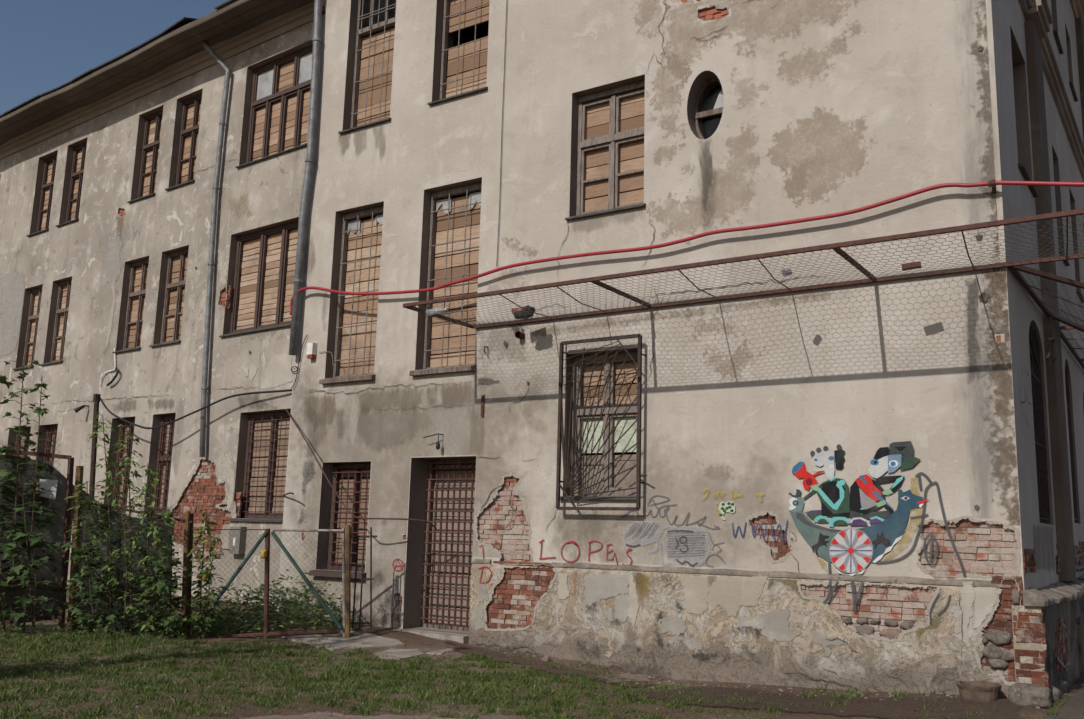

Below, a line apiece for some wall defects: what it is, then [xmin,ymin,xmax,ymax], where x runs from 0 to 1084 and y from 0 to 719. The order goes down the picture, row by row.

crack [648,3,670,67]
flaking render [662,0,841,82]
leakage [970,1,998,221]
leakage [701,146,712,207]
leakage [968,234,1020,525]
flaking render [128,482,144,518]
flaking render [171,451,243,564]
flaking render [471,473,570,632]
flaking render [747,511,793,564]
peeling [583,573,640,658]
peeling [658,574,846,656]
flaking render [796,505,1070,688]